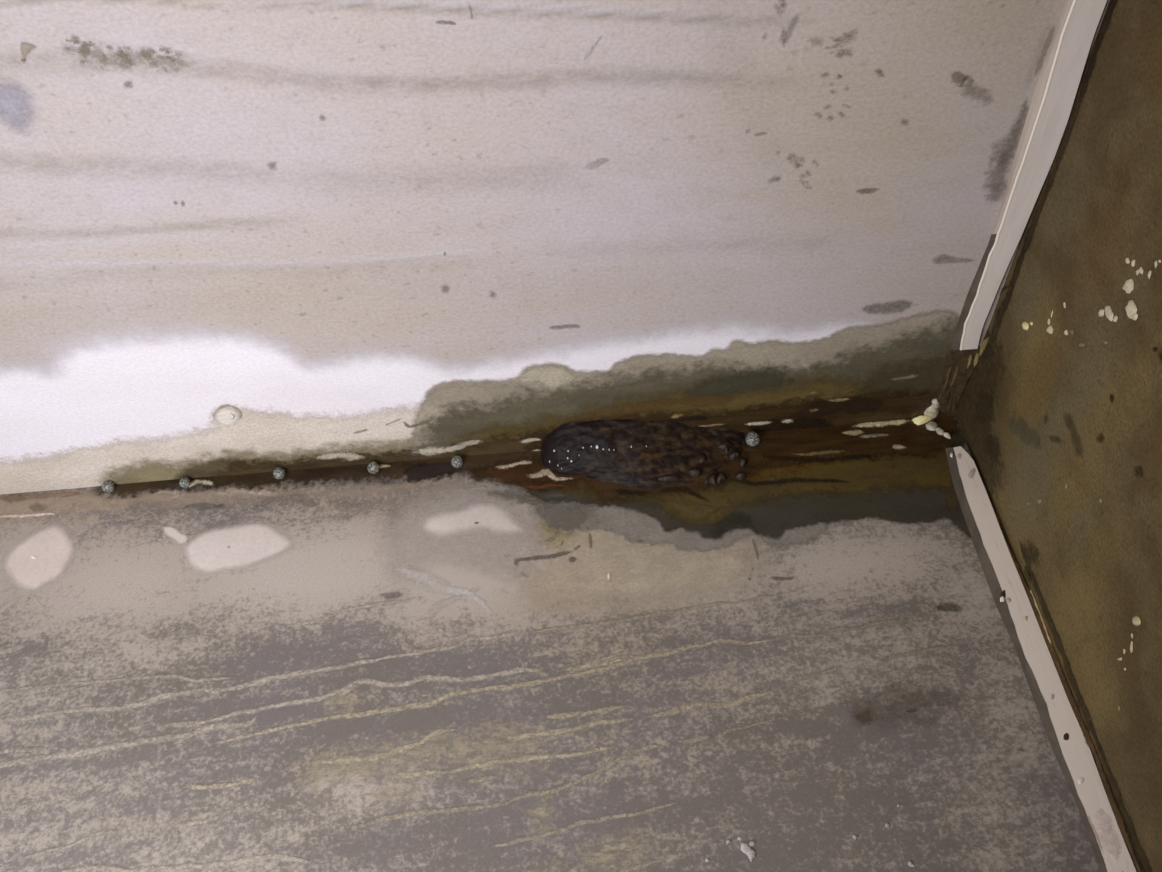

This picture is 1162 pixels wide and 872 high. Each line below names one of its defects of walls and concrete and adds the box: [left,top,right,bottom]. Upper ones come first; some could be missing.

damp [0,0,1117,551]
rust [468,389,959,502]
crack [0,540,907,828]
damp [1020,542,1152,872]